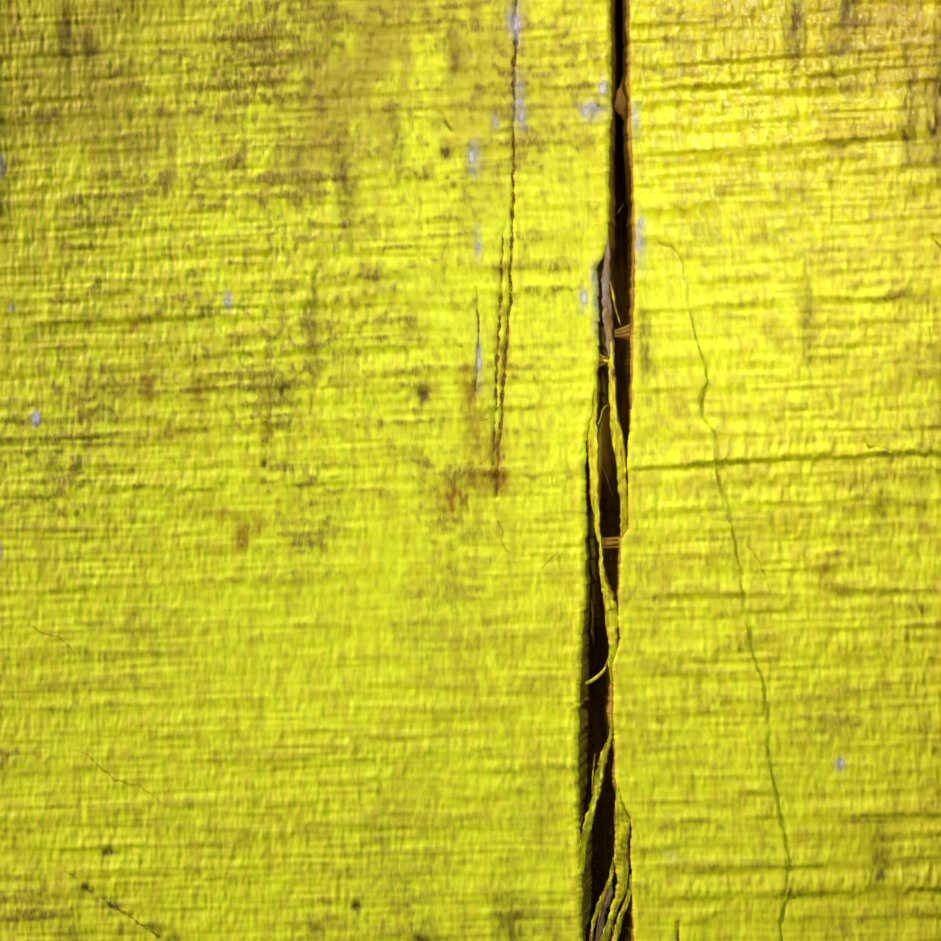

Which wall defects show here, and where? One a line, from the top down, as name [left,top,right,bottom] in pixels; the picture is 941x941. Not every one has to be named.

crack [474,0,519,494]
crack [577,0,636,941]